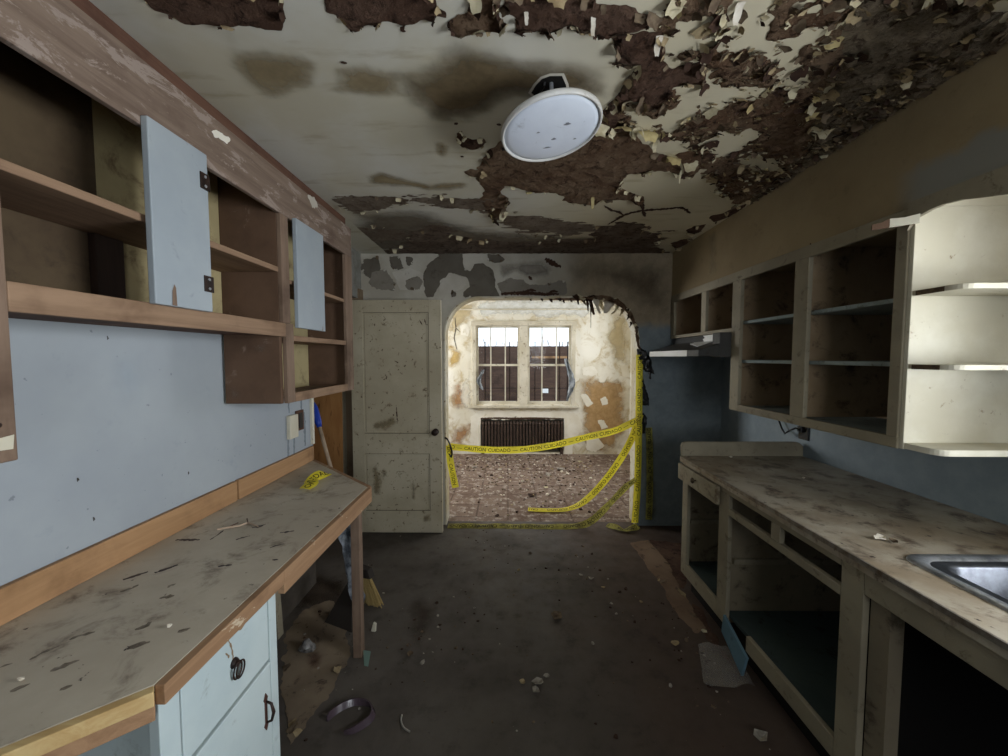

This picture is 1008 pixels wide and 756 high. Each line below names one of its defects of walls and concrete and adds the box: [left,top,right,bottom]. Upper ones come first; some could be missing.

peeling [144,0,286,31]
leakage [345,70,393,93]
leakage [410,54,594,116]
peeling [324,0,1008,349]
crack [604,199,690,225]